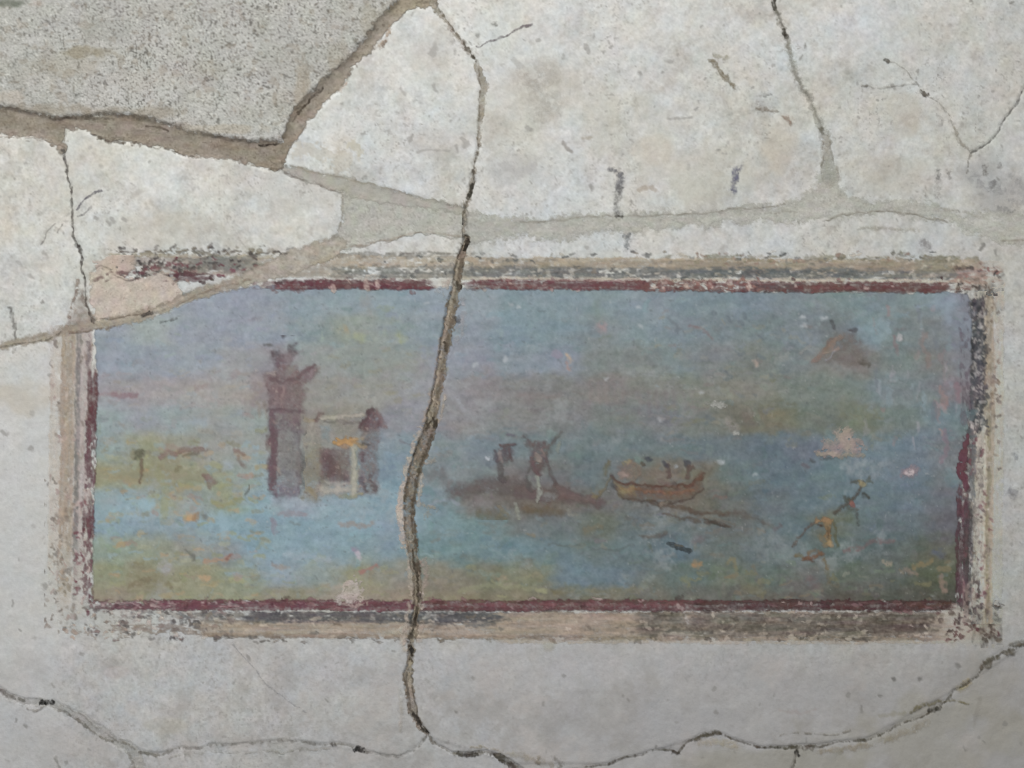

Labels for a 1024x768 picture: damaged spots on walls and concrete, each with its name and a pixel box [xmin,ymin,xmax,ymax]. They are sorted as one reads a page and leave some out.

crack [864,58,929,97]
crack [953,91,1022,156]
flaking render [89,255,182,321]
crack [0,149,346,349]
crack [396,0,881,768]
crack [905,642,1024,722]
crack [0,688,368,768]